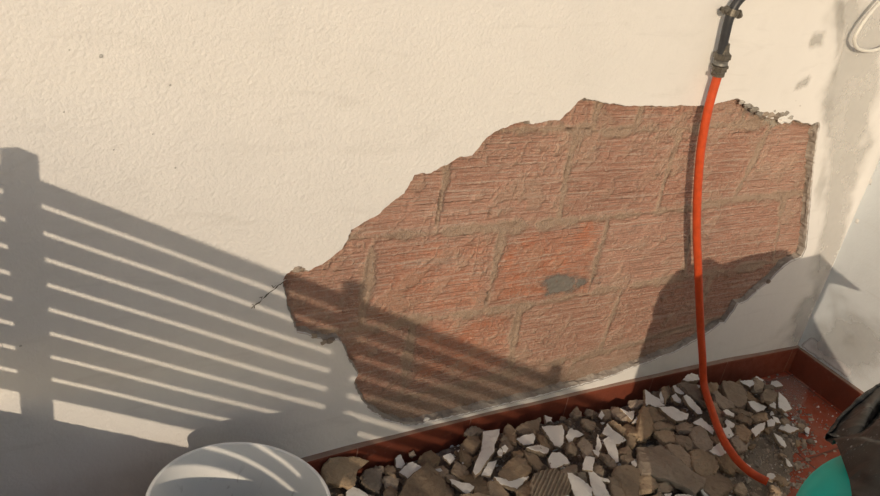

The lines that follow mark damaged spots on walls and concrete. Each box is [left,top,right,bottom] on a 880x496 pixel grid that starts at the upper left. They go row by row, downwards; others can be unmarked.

flaking render [283,98,820,426]